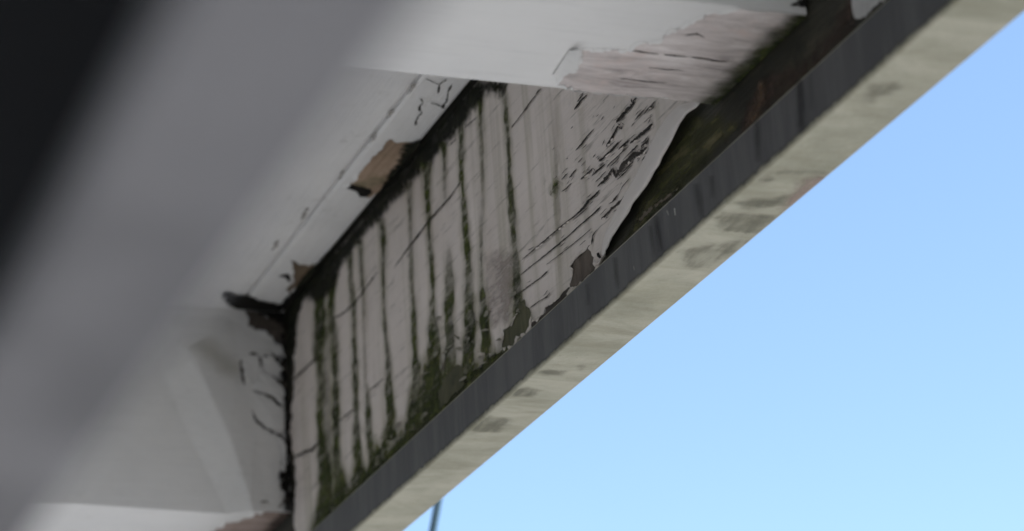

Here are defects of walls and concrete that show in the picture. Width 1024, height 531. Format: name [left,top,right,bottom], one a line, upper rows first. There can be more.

crack [414,79,452,126]
peeling [556,8,803,103]
peeling [340,133,410,198]
leakage [286,80,522,507]
peeling [502,245,601,351]
peeling [221,260,314,465]
crack [240,334,354,511]